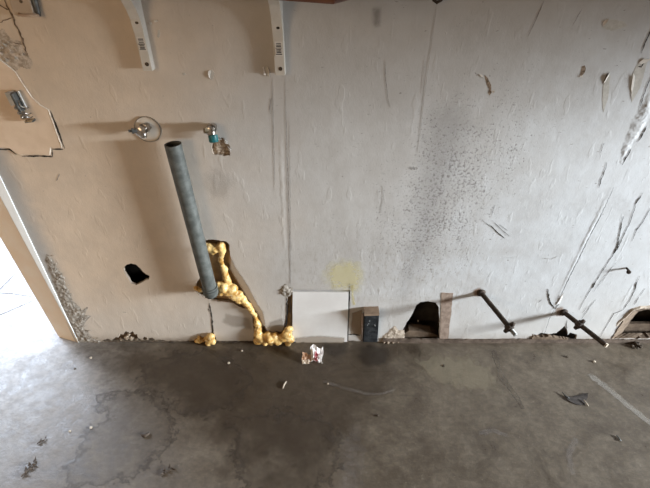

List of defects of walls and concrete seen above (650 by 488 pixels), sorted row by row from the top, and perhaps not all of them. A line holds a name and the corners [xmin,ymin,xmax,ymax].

crack [0,0,28,56]
spalling [0,29,33,71]
spalling [212,137,231,155]
crack [538,127,649,328]
spalling [45,254,104,343]